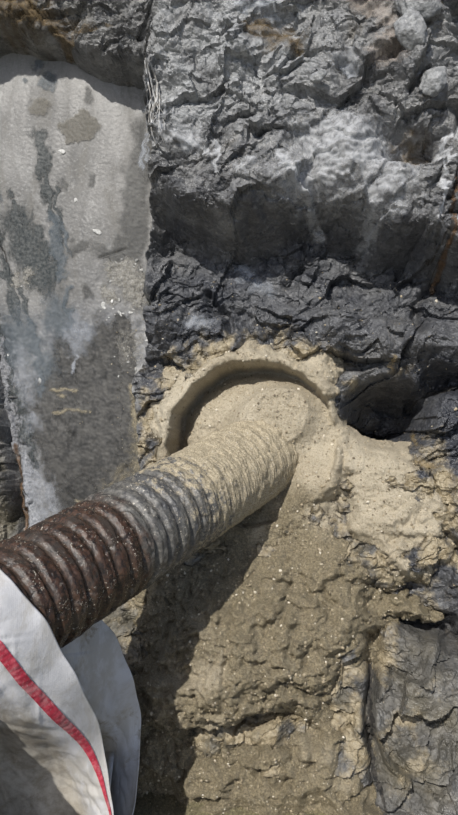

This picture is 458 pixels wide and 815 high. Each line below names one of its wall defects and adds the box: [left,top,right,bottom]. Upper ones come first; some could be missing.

damp [29,60,56,115]
damp [57,86,100,144]
damp [100,99,220,260]
damp [0,129,140,510]
crack [360,662,390,815]